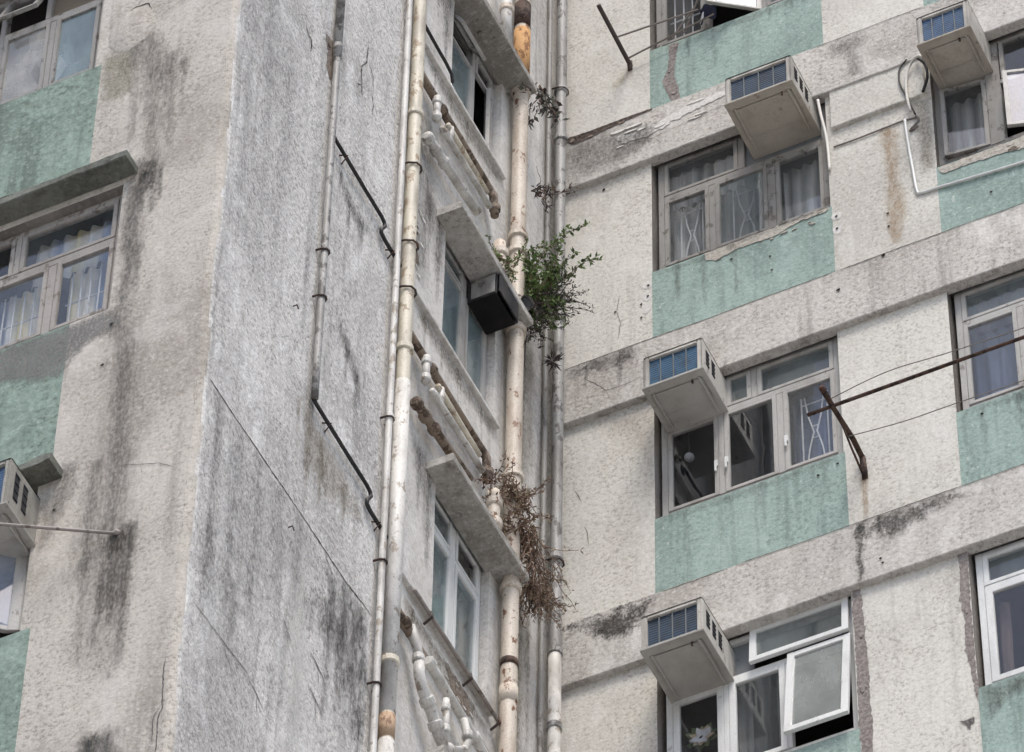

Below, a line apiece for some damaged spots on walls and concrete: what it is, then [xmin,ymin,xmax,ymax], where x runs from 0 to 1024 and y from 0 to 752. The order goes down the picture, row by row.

peeling [568,91,725,149]
peeling [704,208,829,261]
water stain [855,494,955,581]
water stain [322,590,363,682]
water stain [568,601,649,638]
crack [151,658,166,752]